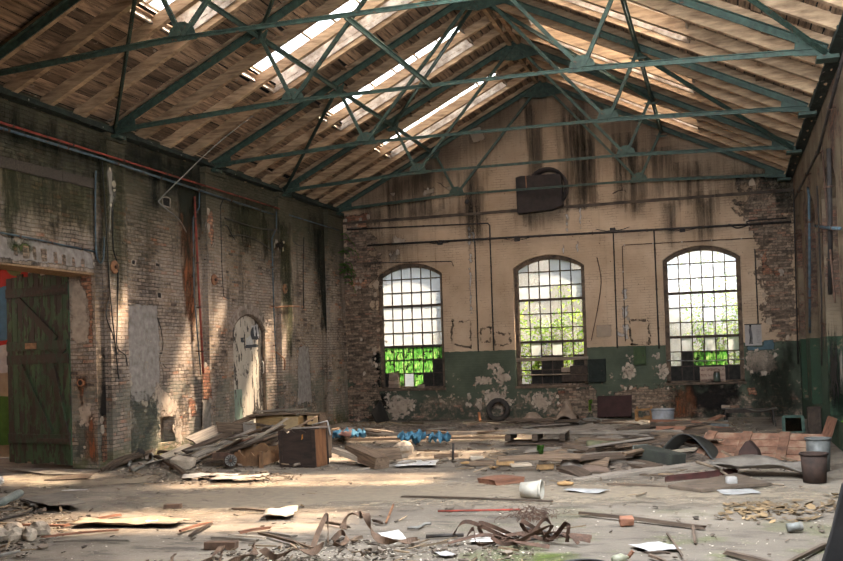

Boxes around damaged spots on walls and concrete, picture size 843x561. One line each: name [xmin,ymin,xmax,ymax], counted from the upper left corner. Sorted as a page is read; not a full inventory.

corrosion [180,206,195,341]
peeling [732,170,799,376]
peeling [465,363,597,416]
peeling [614,352,679,412]